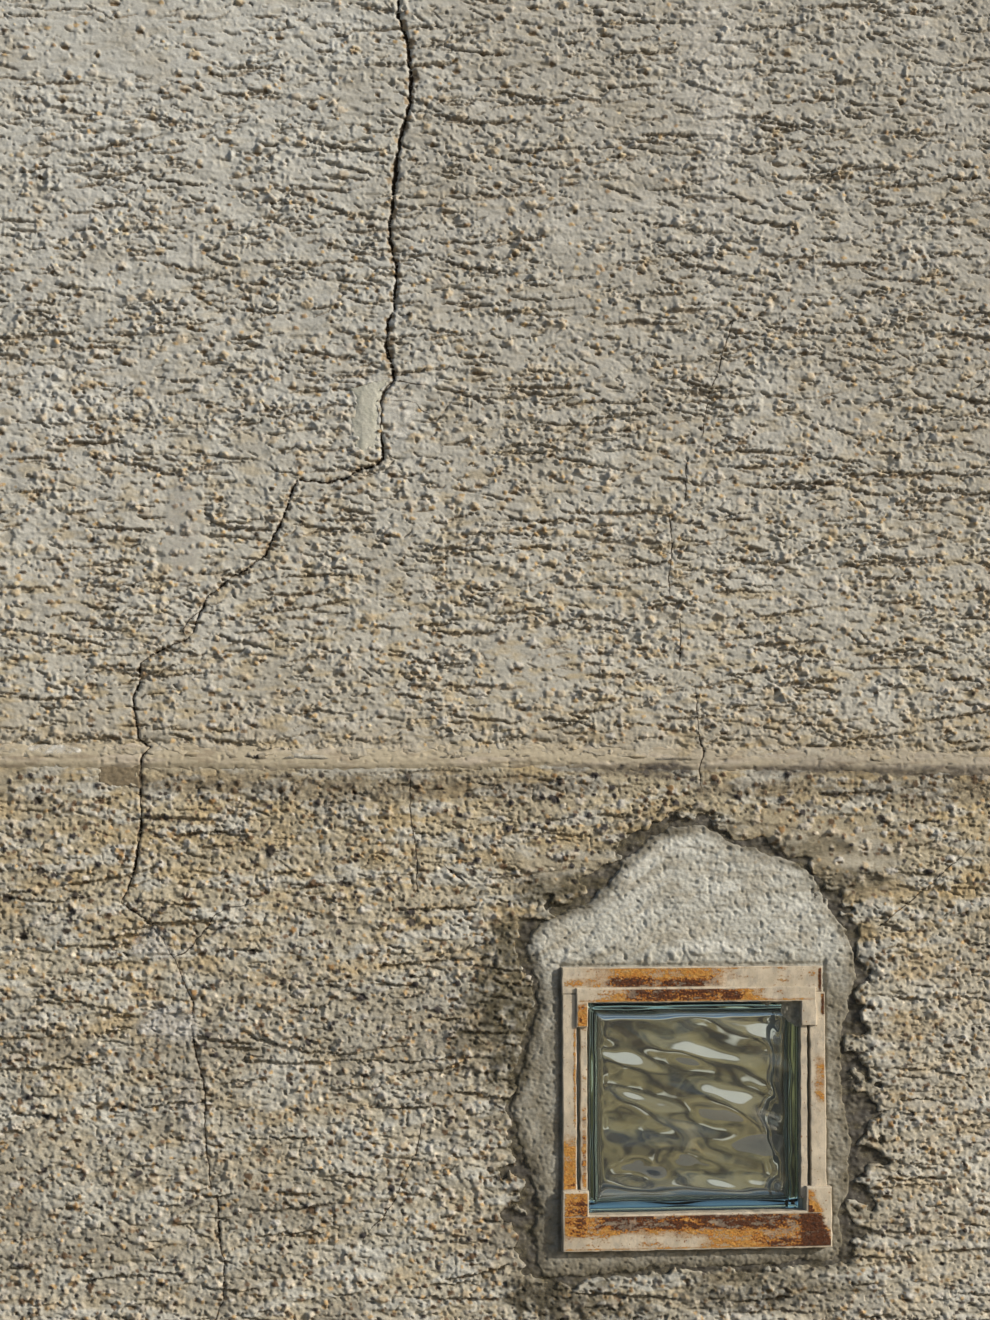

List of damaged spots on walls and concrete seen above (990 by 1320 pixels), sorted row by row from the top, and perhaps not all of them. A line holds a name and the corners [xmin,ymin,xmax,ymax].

crack [121,0,430,1319]
water stain [451,825,678,1103]
water stain [504,1122,670,1320]
rust [564,967,831,1251]
water stain [839,1023,871,1095]